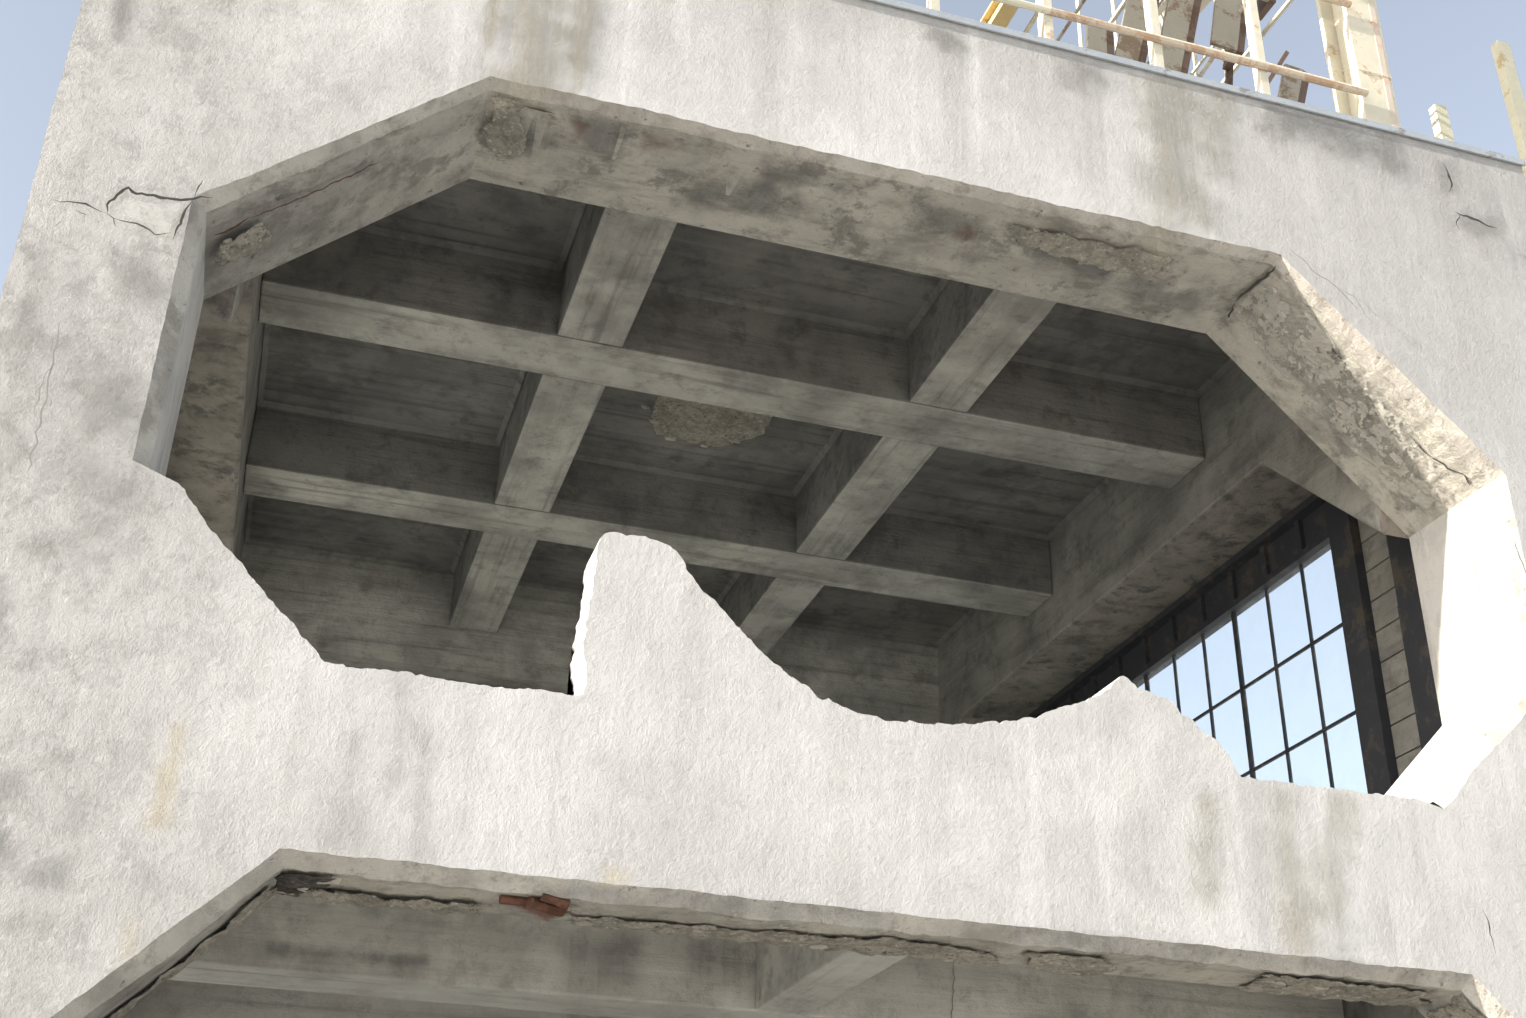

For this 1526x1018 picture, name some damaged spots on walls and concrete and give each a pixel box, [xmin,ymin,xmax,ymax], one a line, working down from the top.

crack [53,163,377,239]
crack [1442,162,1496,228]
spalling [215,222,273,266]
crack [27,323,60,474]
spalling [641,396,773,448]
peeling [1235,284,1440,509]
corrosion [499,893,570,920]
spalling [1237,974,1484,1018]